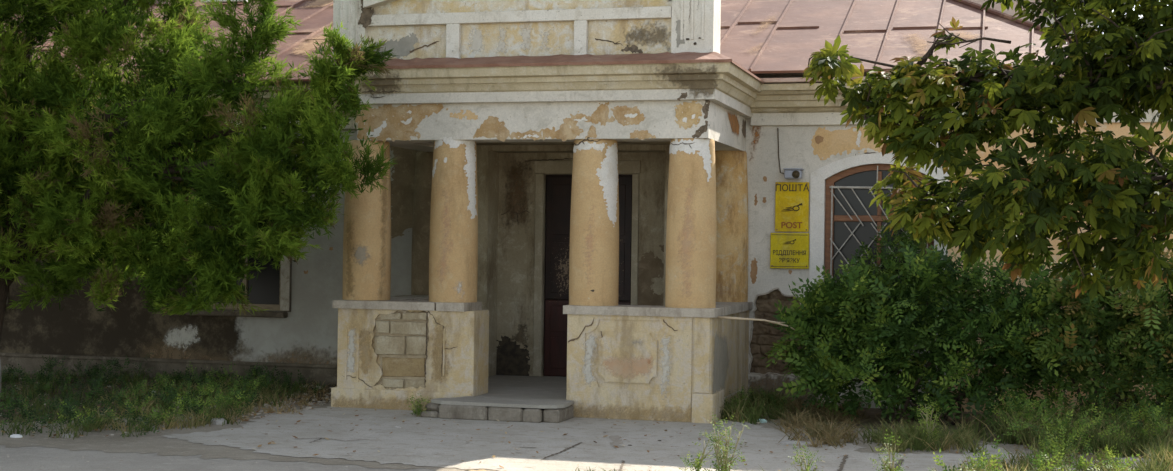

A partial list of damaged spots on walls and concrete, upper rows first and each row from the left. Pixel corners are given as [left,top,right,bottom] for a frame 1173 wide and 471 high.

peeling [355,102,656,238]
peeling [669,92,712,182]
peeling [811,126,893,160]
peeling [549,238,569,302]
peeling [638,245,664,306]
peeling [166,326,200,348]
flaking render [374,311,429,390]
flaking render [748,258,805,377]